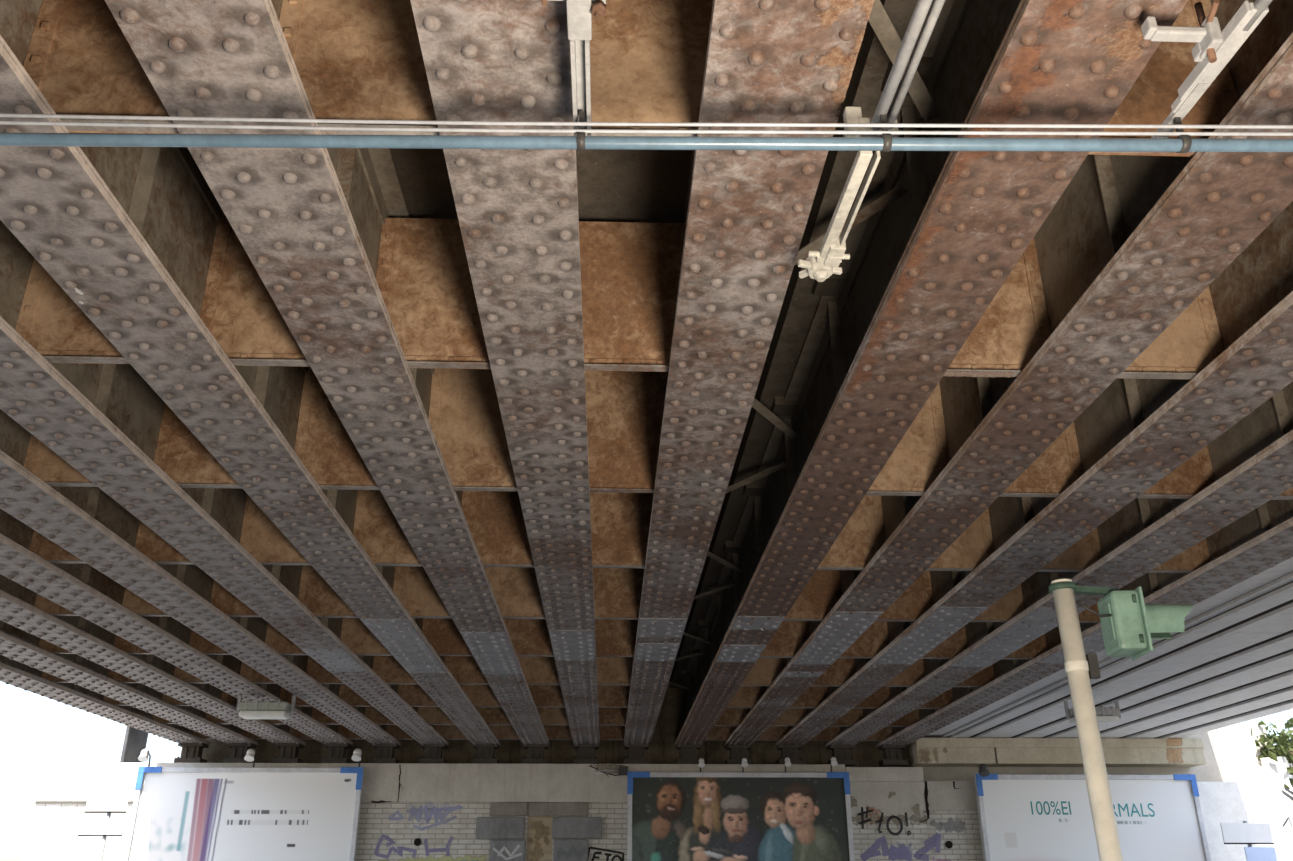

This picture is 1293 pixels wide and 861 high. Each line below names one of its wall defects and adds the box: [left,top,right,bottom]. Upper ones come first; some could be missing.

crack [371,765,403,803]
crack [921,781,959,822]